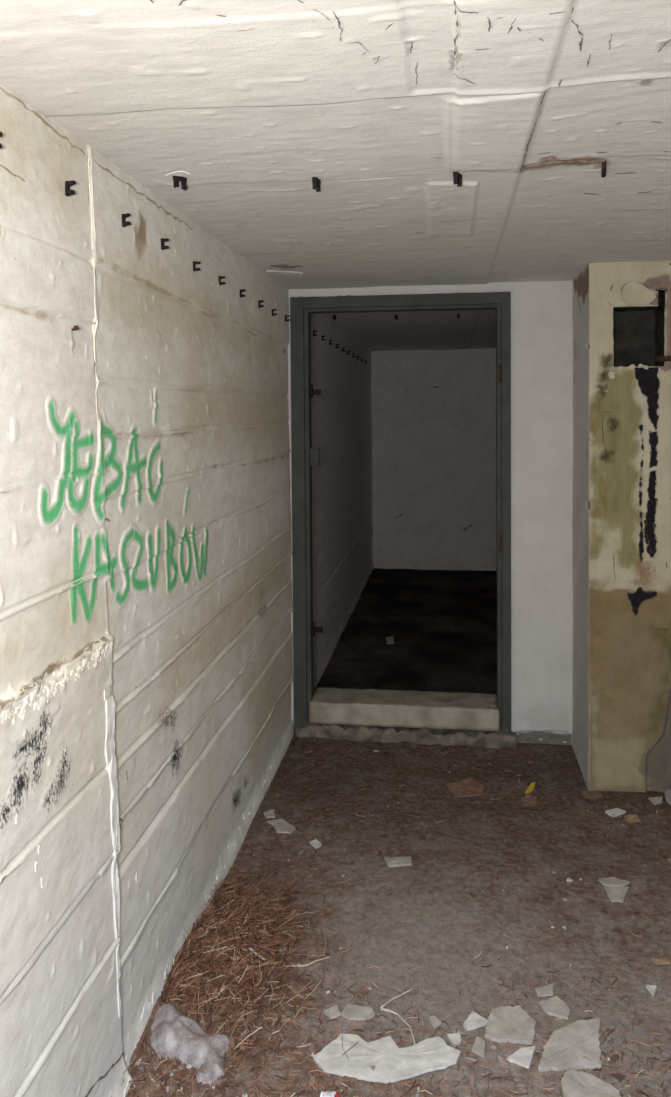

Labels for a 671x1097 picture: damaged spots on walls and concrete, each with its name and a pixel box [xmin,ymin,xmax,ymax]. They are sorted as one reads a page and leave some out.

crack [297,0,613,84]
crack [634,79,662,87]
crack [649,36,671,52]
crack [480,79,564,172]
crack [583,172,652,195]
flaking render [604,272,671,392]
damp [0,85,294,838]
damp [511,340,671,793]
spalling [2,643,109,725]
crack [85,1051,124,1097]